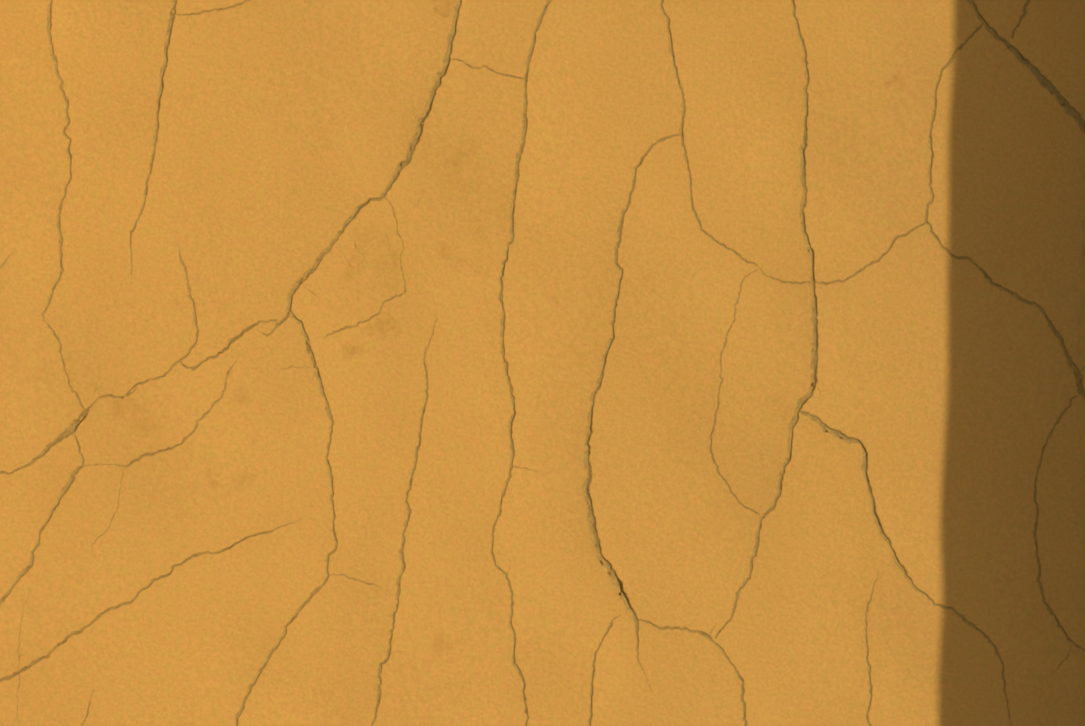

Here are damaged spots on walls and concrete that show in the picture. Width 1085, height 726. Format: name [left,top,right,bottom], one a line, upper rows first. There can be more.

crack [0,0,552,726]
crack [582,0,1085,726]